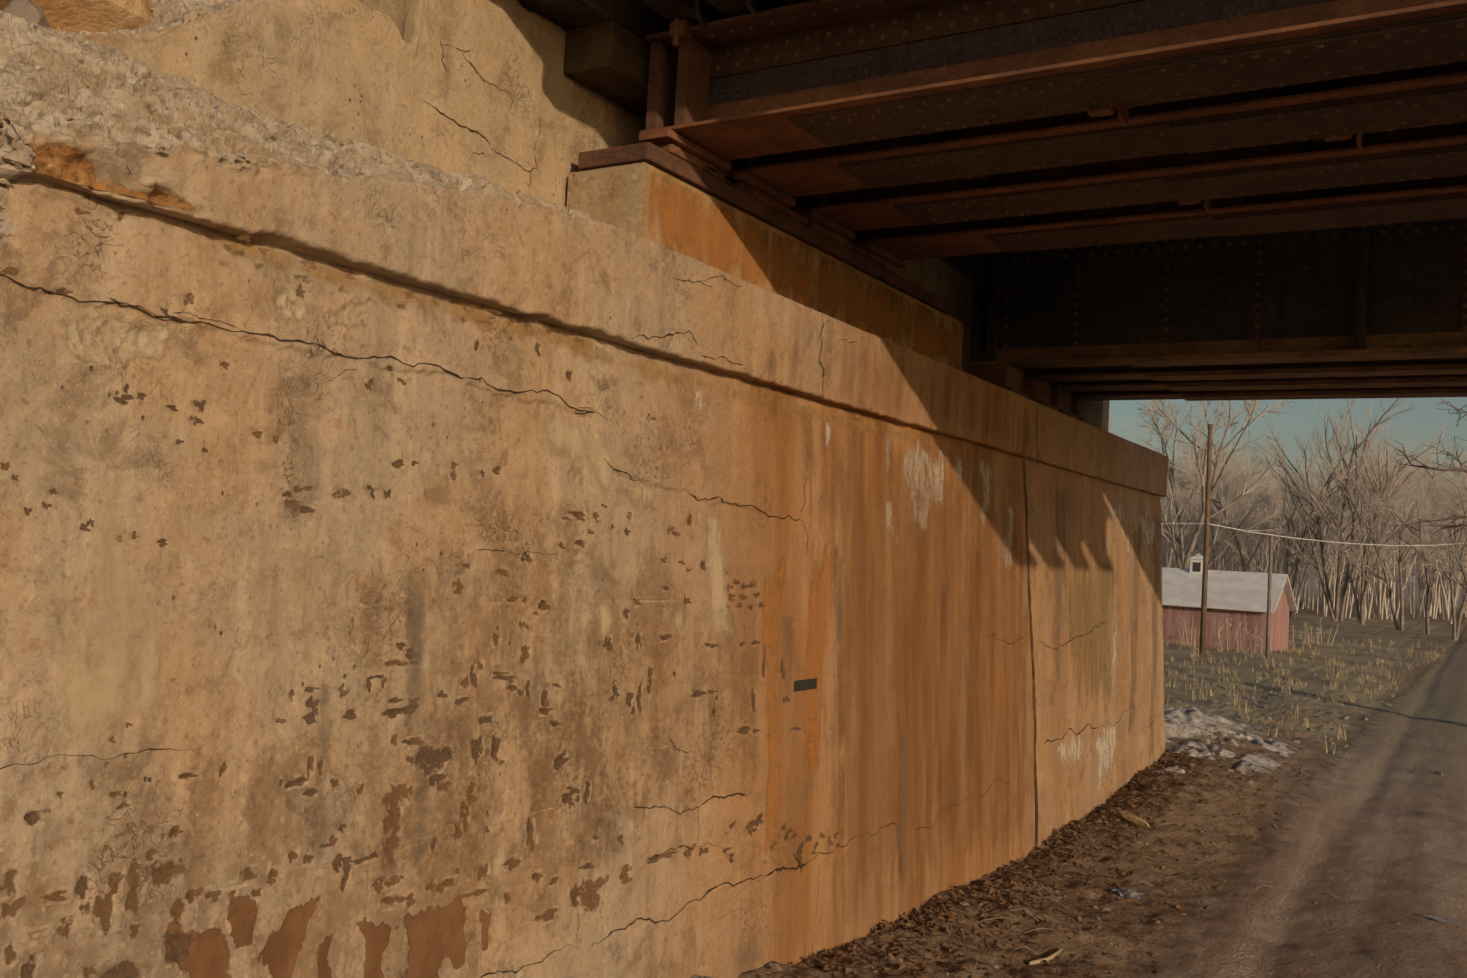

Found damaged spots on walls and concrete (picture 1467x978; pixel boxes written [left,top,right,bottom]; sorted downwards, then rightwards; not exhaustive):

spalling [0,0,589,247]
crack [424,40,541,186]
spalling [66,293,194,405]
crack [0,274,605,418]
corrosion [652,176,962,370]
damp [885,433,1014,568]
crack [0,748,194,769]
peeling [367,597,561,838]
crack [477,413,1160,978]
damp [1057,720,1116,790]
peeling [0,848,185,940]
peeling [165,781,734,963]